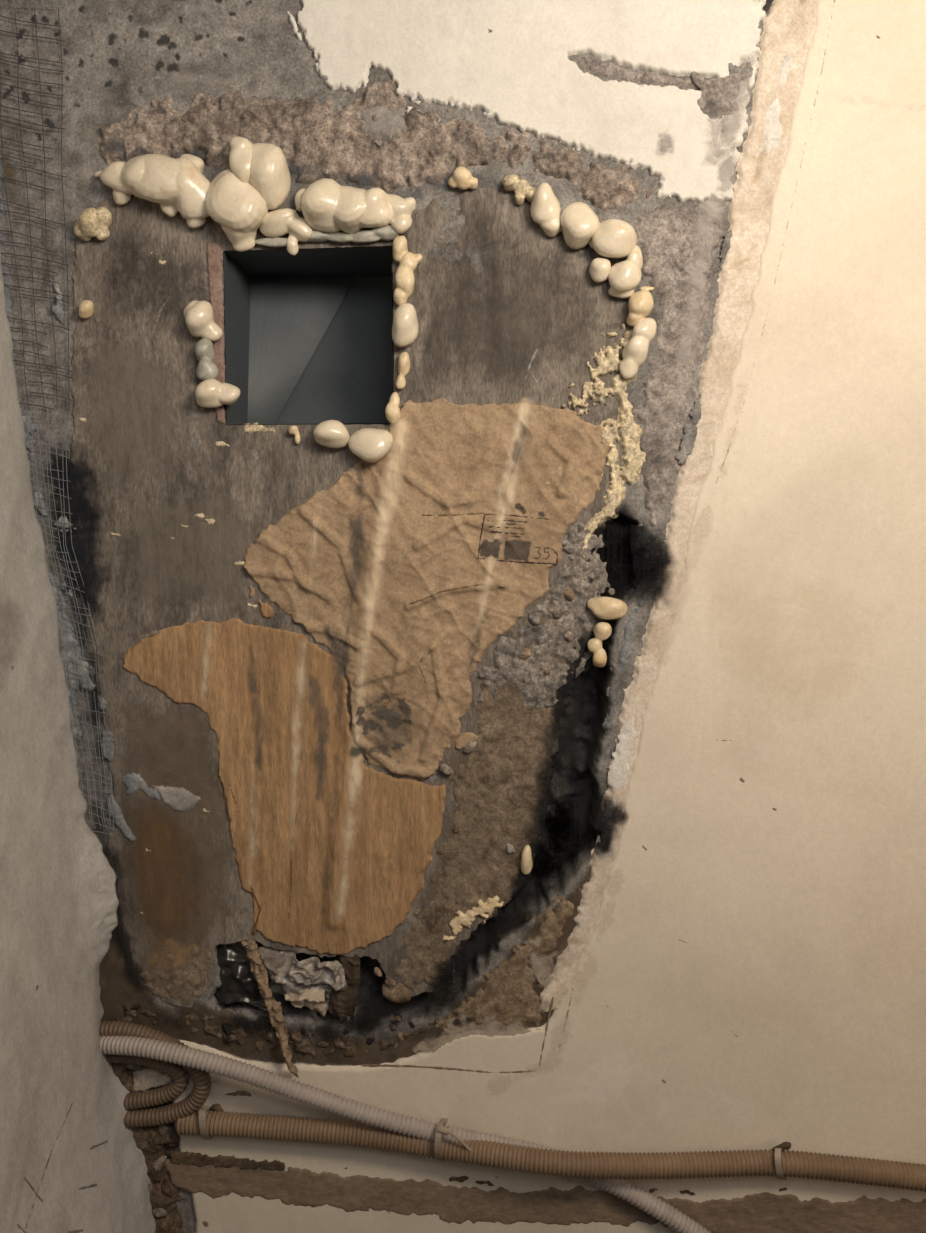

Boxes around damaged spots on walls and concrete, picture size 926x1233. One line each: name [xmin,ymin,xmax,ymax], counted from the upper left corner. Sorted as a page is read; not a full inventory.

spalling [3,15,61,103]
damp [680,200,722,356]
damp [47,451,104,724]
flaking render [97,0,819,1061]
damp [95,678,591,1066]
spalling [164,1150,668,1227]
spalling [649,1187,926,1233]